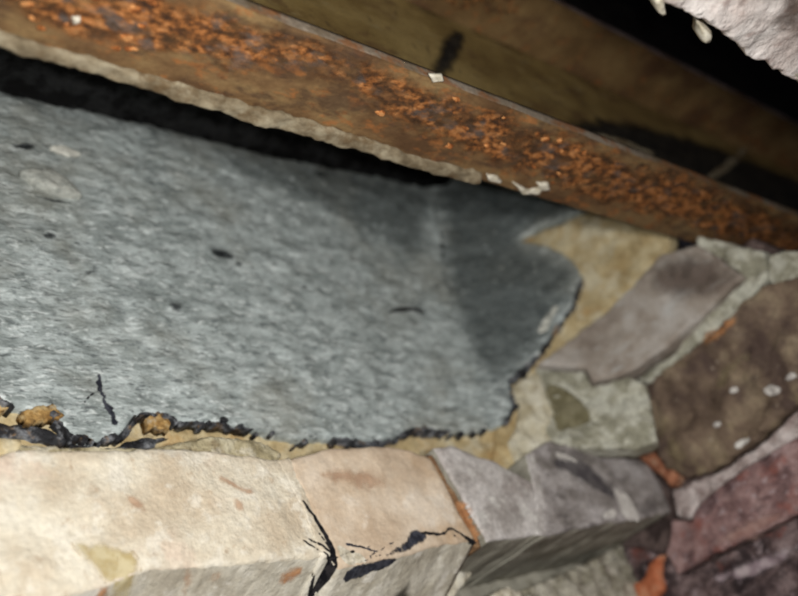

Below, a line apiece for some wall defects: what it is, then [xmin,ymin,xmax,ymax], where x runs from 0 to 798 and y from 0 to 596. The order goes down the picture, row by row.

corrosion [6,0,343,76]
corrosion [356,63,798,251]
crack [84,370,118,425]
crack [302,500,355,596]
crack [422,527,477,546]